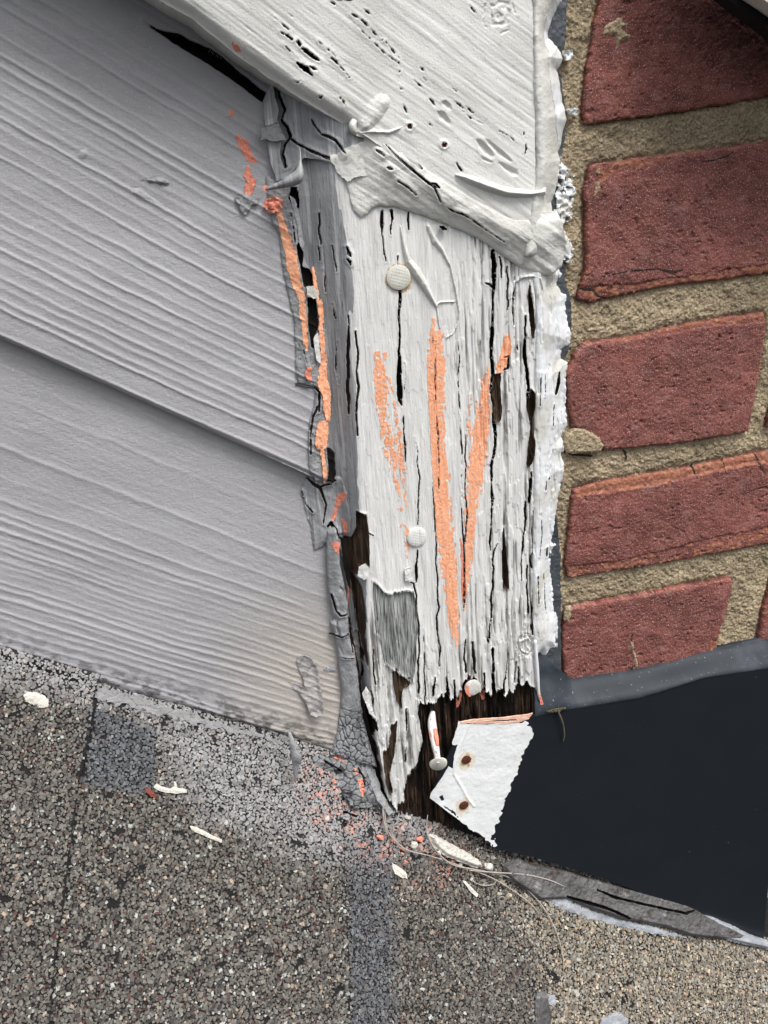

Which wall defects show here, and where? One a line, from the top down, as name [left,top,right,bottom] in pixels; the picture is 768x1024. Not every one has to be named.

crack [331,2,474,125]
peeling [306,286,319,299]
peeling [313,333,321,363]
crack [295,350,374,538]
crack [376,144,560,763]
peeling [288,655,324,717]
crack [329,594,376,707]
peeling [362,687,376,718]
peeling [357,564,418,709]
peeling [383,721,397,796]
rust [456,750,476,771]
rust [456,796,472,817]